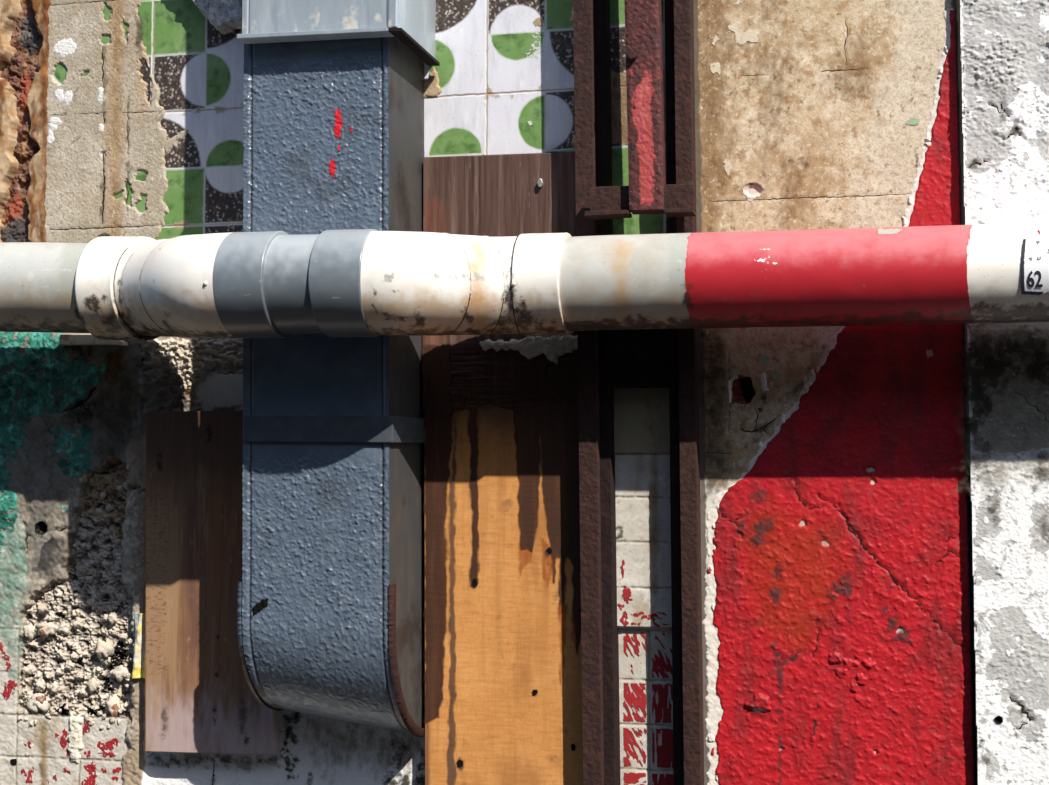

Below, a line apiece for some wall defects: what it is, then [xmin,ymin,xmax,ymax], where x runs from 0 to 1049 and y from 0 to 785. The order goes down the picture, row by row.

rust [0,79,8,135]
rust [30,0,51,242]
peeling [901,0,1049,227]
damp [956,333,1049,490]
spalling [0,332,146,785]
damp [150,712,300,779]
damp [422,344,581,785]
peeling [617,560,674,785]
peeling [702,323,1049,785]
crack [794,482,972,654]
crack [1010,697,1031,730]